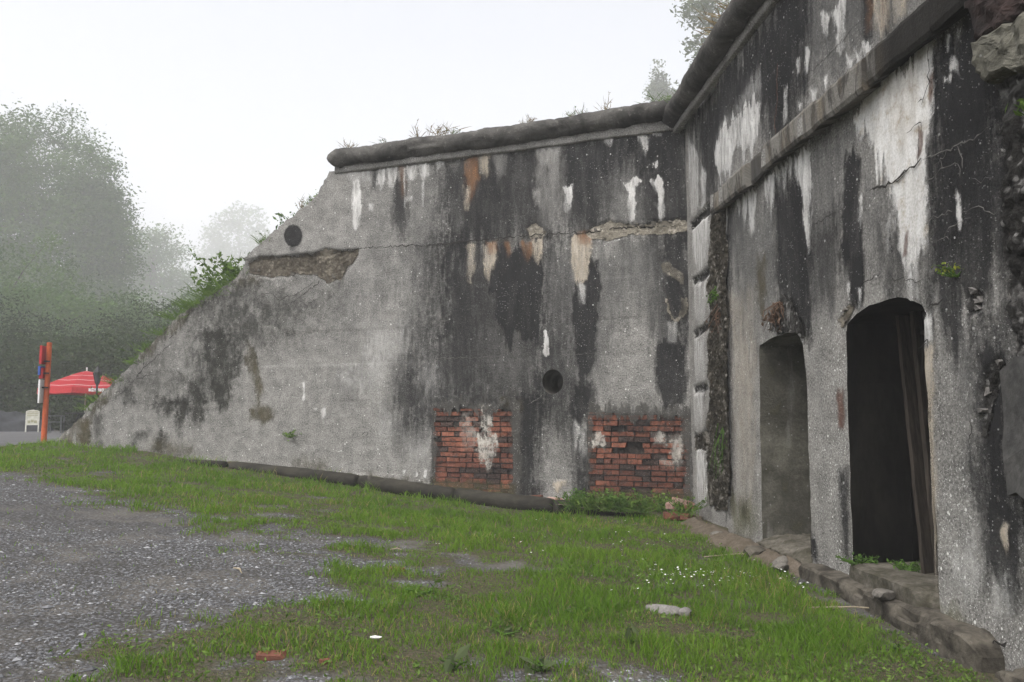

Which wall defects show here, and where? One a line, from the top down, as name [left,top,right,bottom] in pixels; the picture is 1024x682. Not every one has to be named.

rust [464,155,488,194]
crack [869,47,1000,240]
spalling [248,248,359,284]
water stain [392,0,890,521]
water stain [154,327,241,428]
spalling [584,204,732,511]
peeling [429,384,524,495]